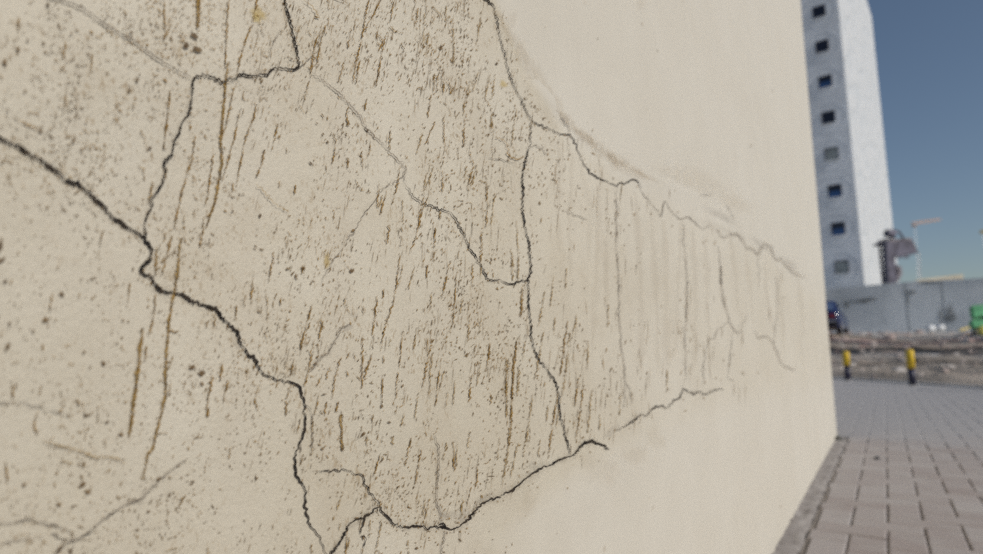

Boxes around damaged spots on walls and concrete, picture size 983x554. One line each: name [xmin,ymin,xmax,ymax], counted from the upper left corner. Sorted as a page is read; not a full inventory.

crack [0,0,711,554]
crack [617,254,747,430]